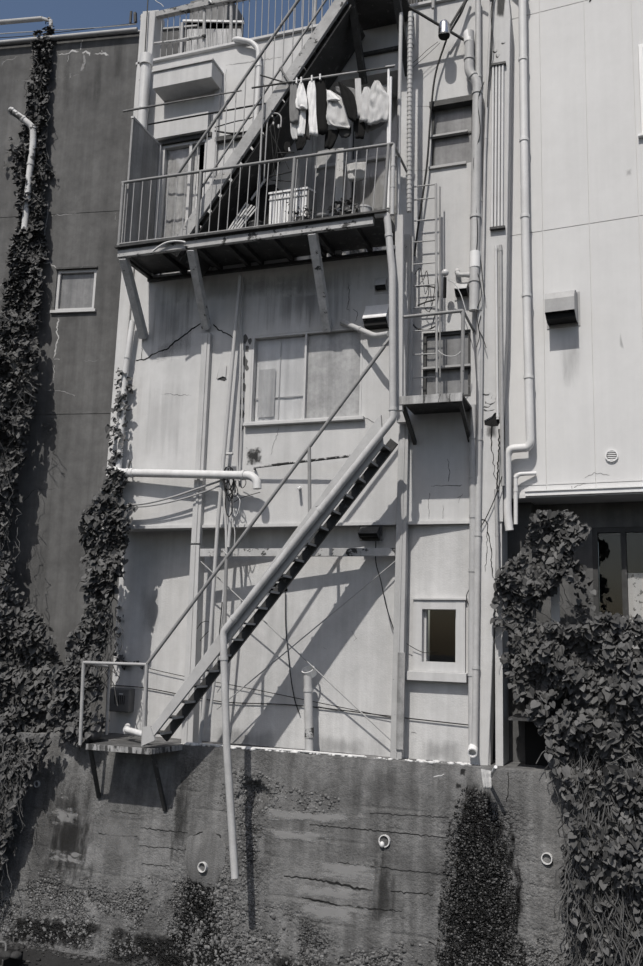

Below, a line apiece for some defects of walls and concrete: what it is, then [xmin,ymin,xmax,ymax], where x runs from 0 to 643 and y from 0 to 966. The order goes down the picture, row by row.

crack [50,40,108,79]
crack [39,262,75,396]
crack [136,323,233,361]
damp [436,769,527,966]